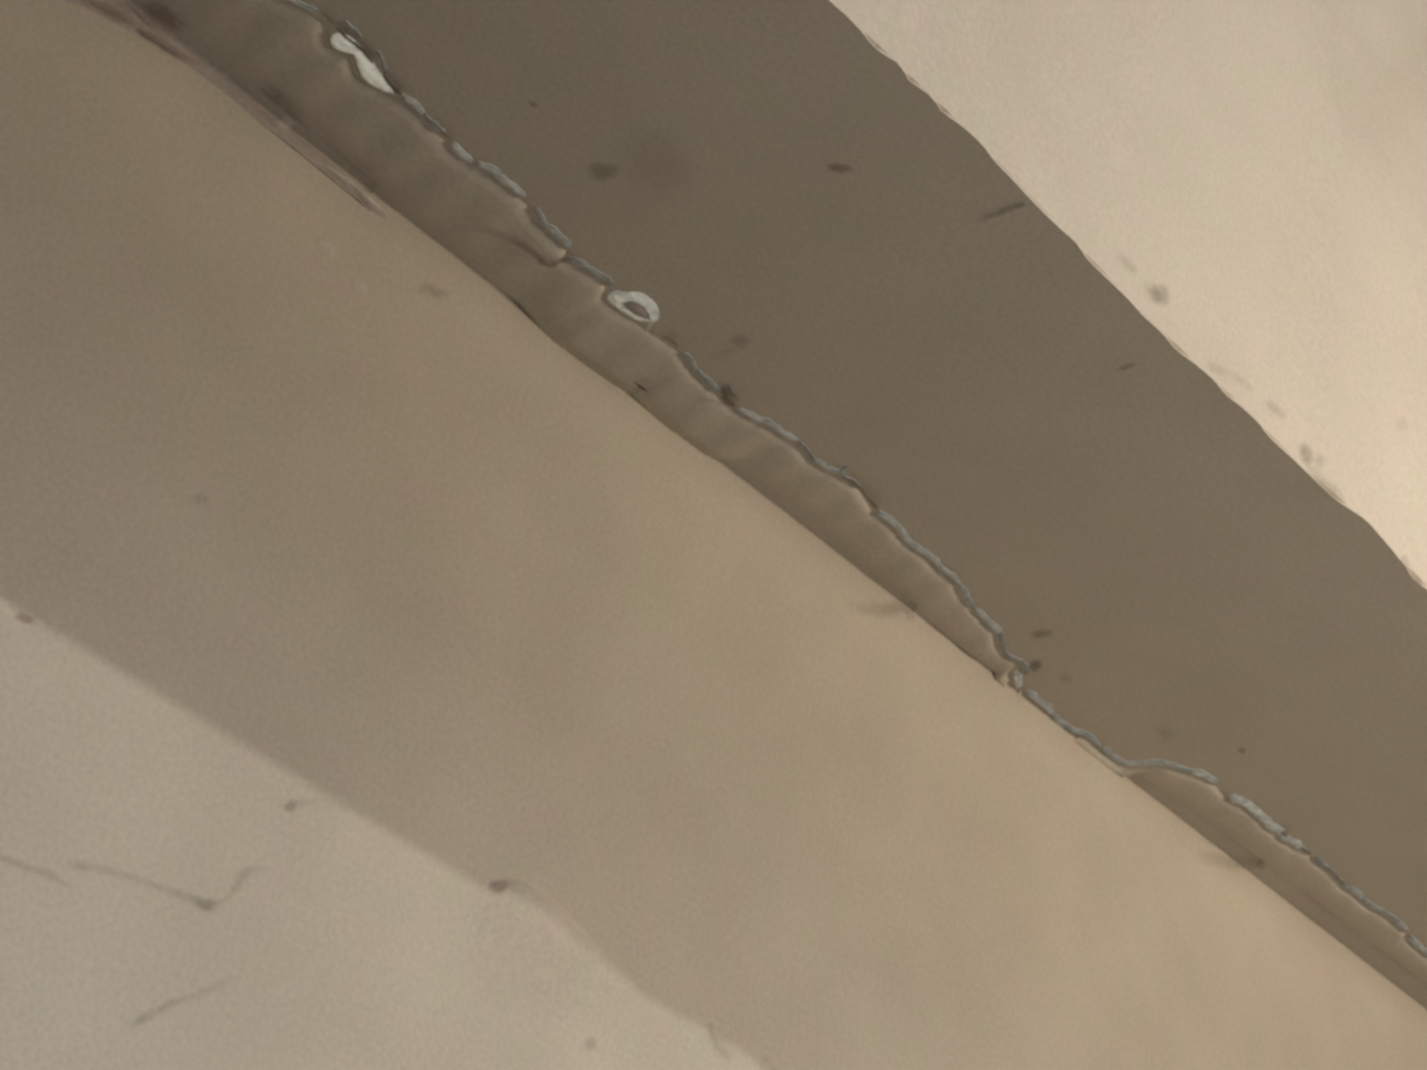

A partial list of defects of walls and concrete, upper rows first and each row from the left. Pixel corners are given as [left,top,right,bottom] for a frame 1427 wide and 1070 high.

crack [286,0,614,286]
crack [664,337,1427,956]